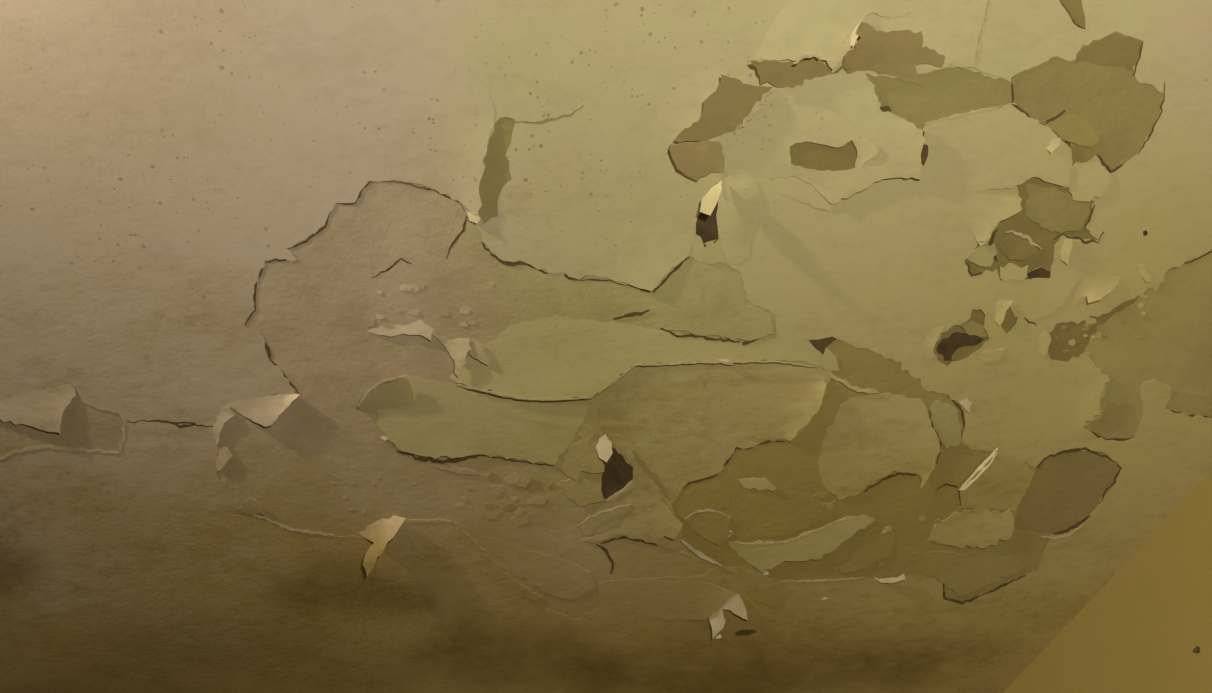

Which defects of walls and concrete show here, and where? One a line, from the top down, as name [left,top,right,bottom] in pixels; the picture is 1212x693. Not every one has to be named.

flaking render [213,0,1212,639]
peeling [0,384,126,460]
crack [127,419,213,428]